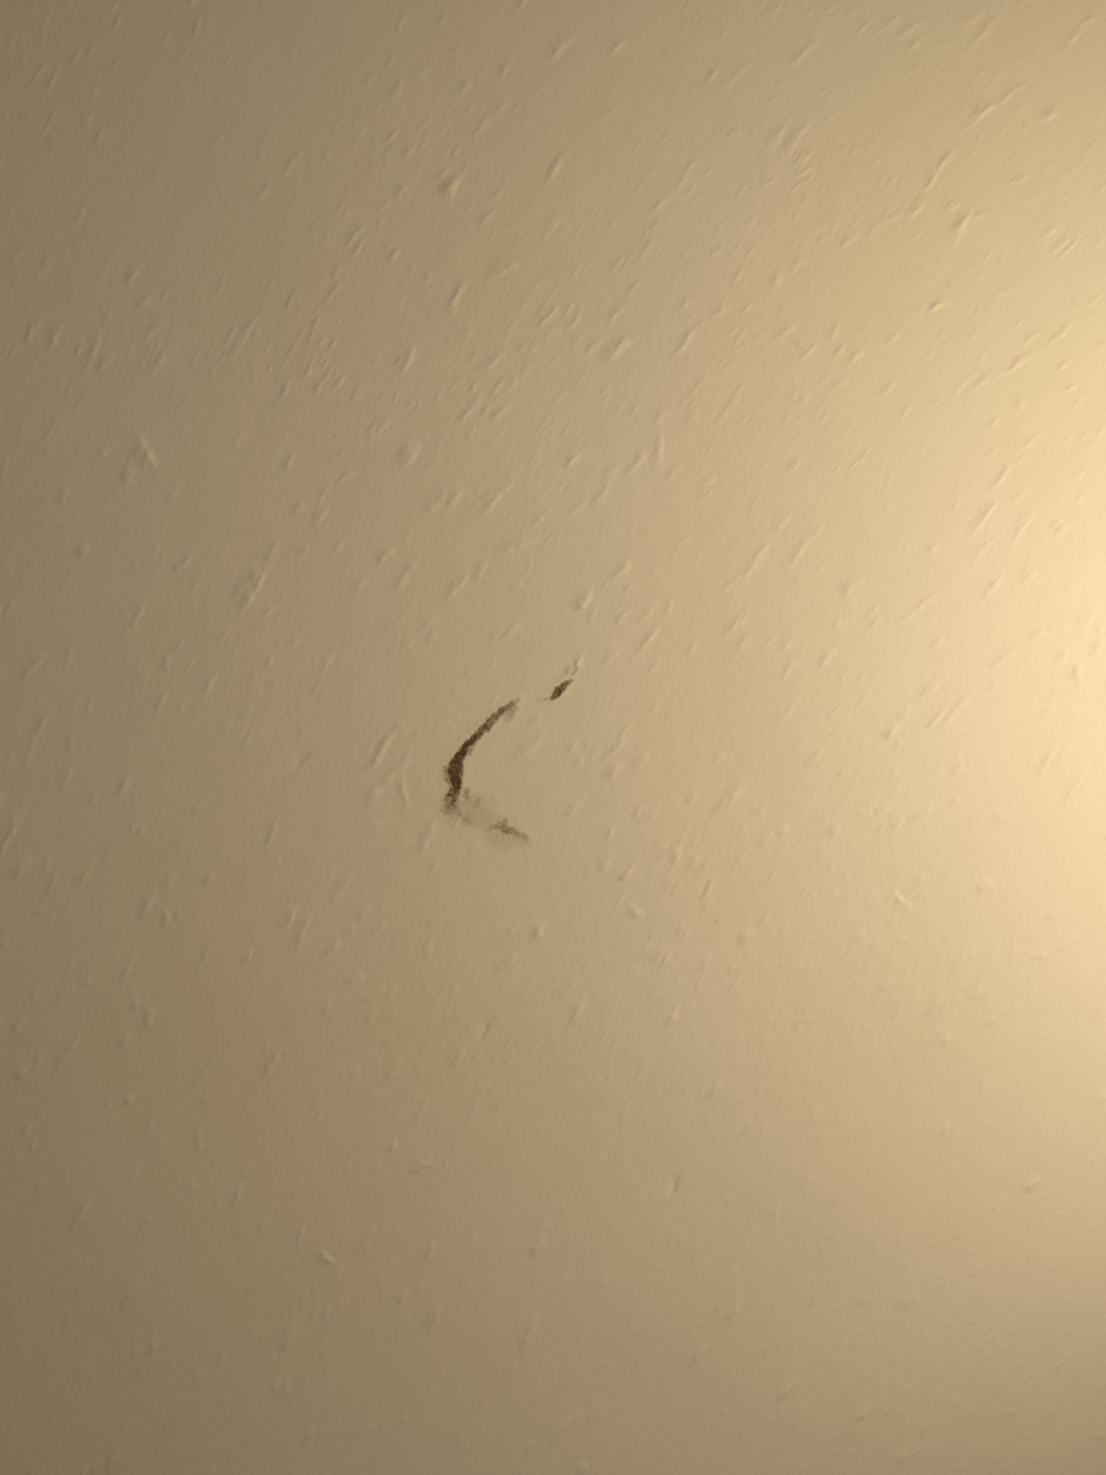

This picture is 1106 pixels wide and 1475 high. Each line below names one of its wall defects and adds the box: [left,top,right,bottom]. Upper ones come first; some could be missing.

crack [433,659,586,854]